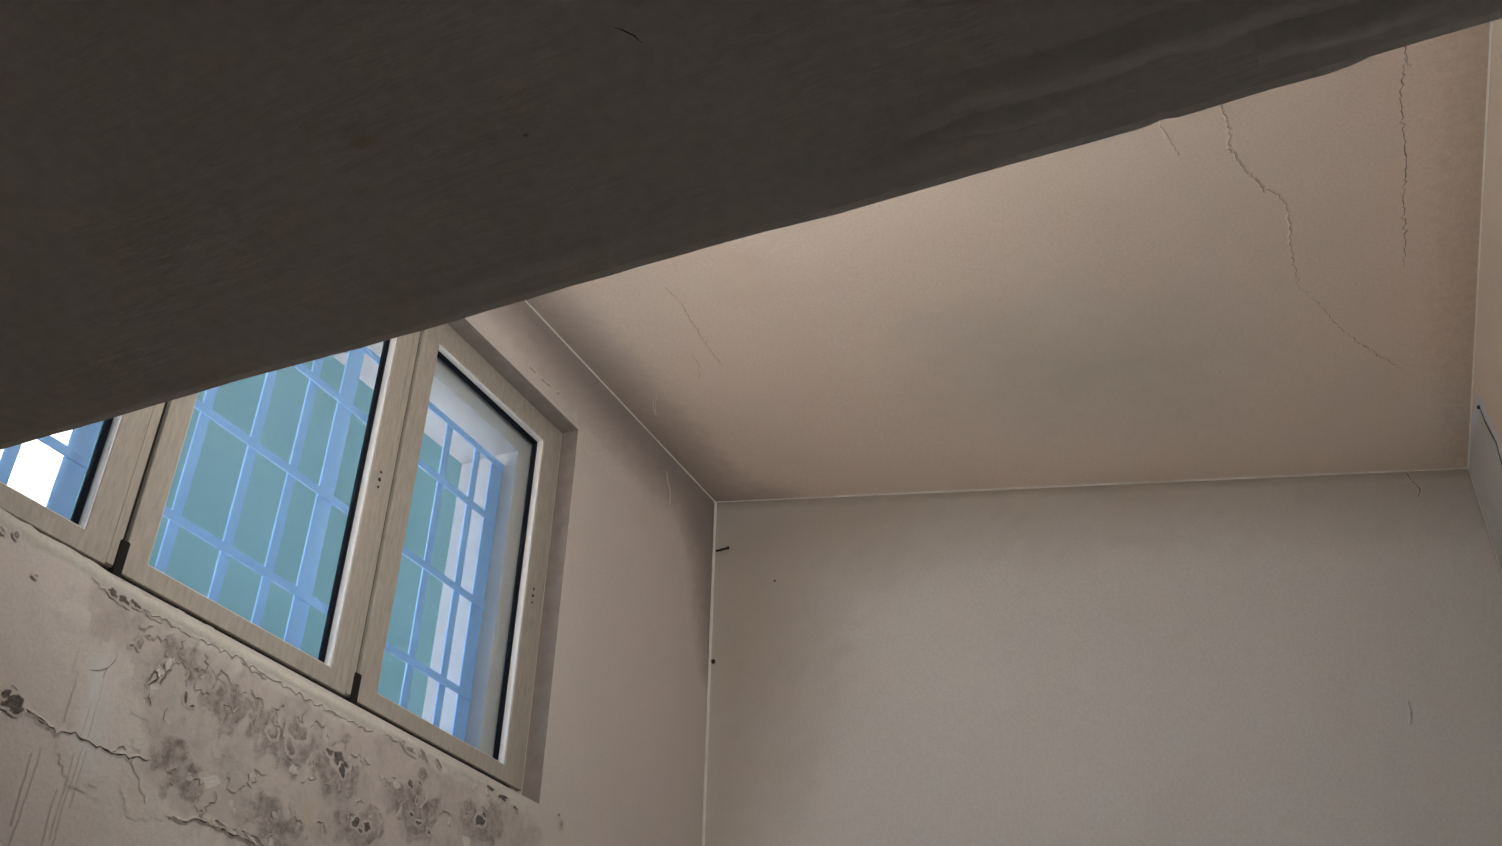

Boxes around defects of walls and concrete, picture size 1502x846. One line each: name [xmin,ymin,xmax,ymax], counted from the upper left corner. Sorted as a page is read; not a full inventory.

crack [1218,104,1400,368]
crack [1398,46,1412,266]
crack [0,684,161,805]
water stain [54,629,155,822]
water stain [179,756,247,846]